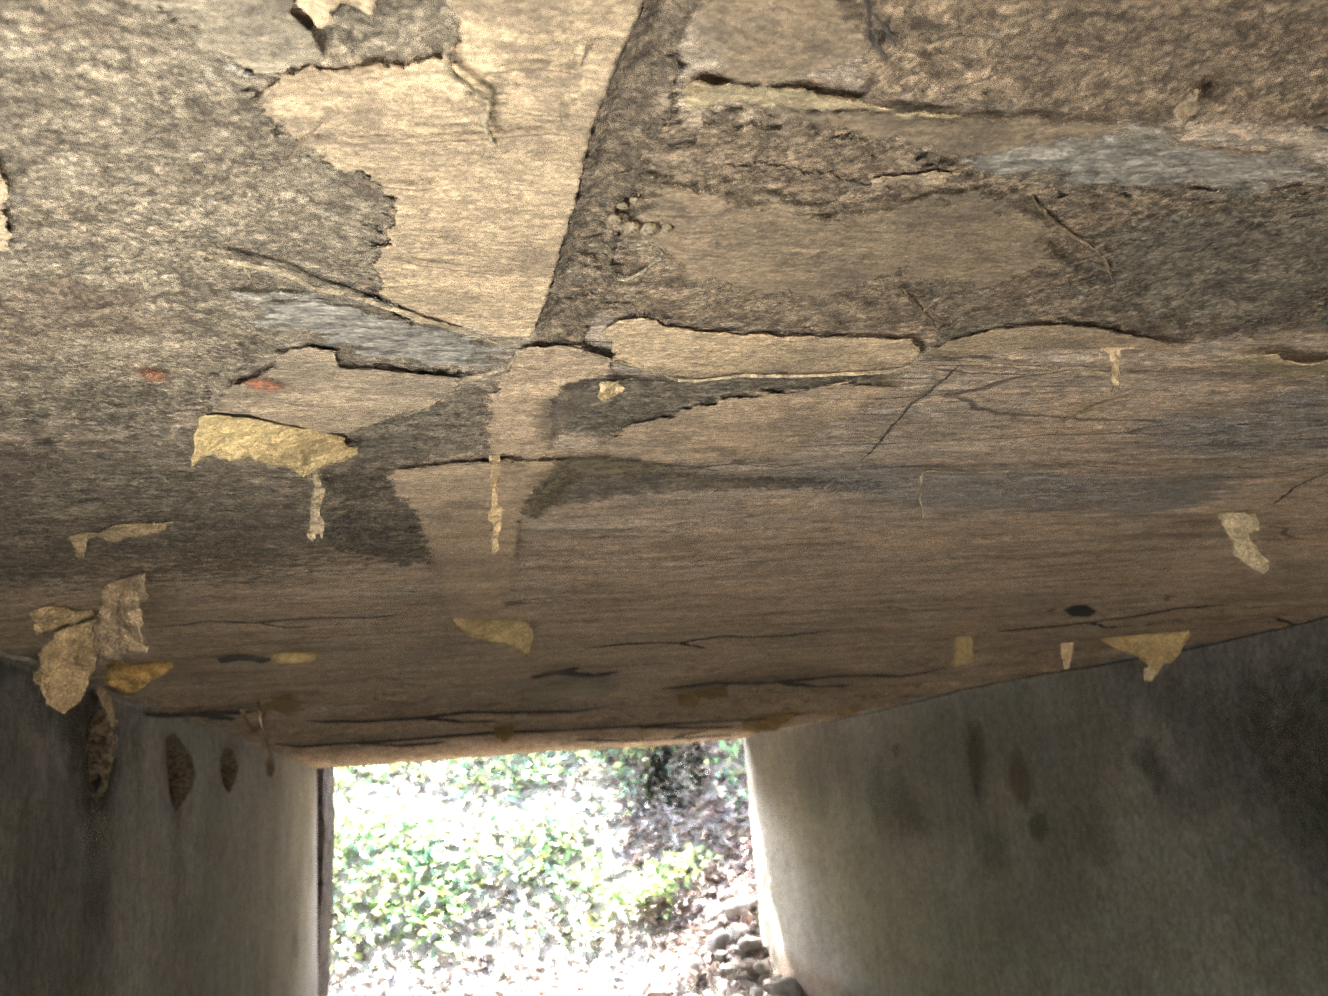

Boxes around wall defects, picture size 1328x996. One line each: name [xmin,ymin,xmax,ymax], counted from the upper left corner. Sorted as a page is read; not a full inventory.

crack [395,257,507,277]
spalling [0,0,1328,715]
crack [665,365,960,471]
crack [1258,473,1327,507]
spalling [87,686,120,805]
peeling [493,726,515,743]
peeling [741,711,800,733]
spalling [166,734,196,810]
spalling [220,749,238,793]